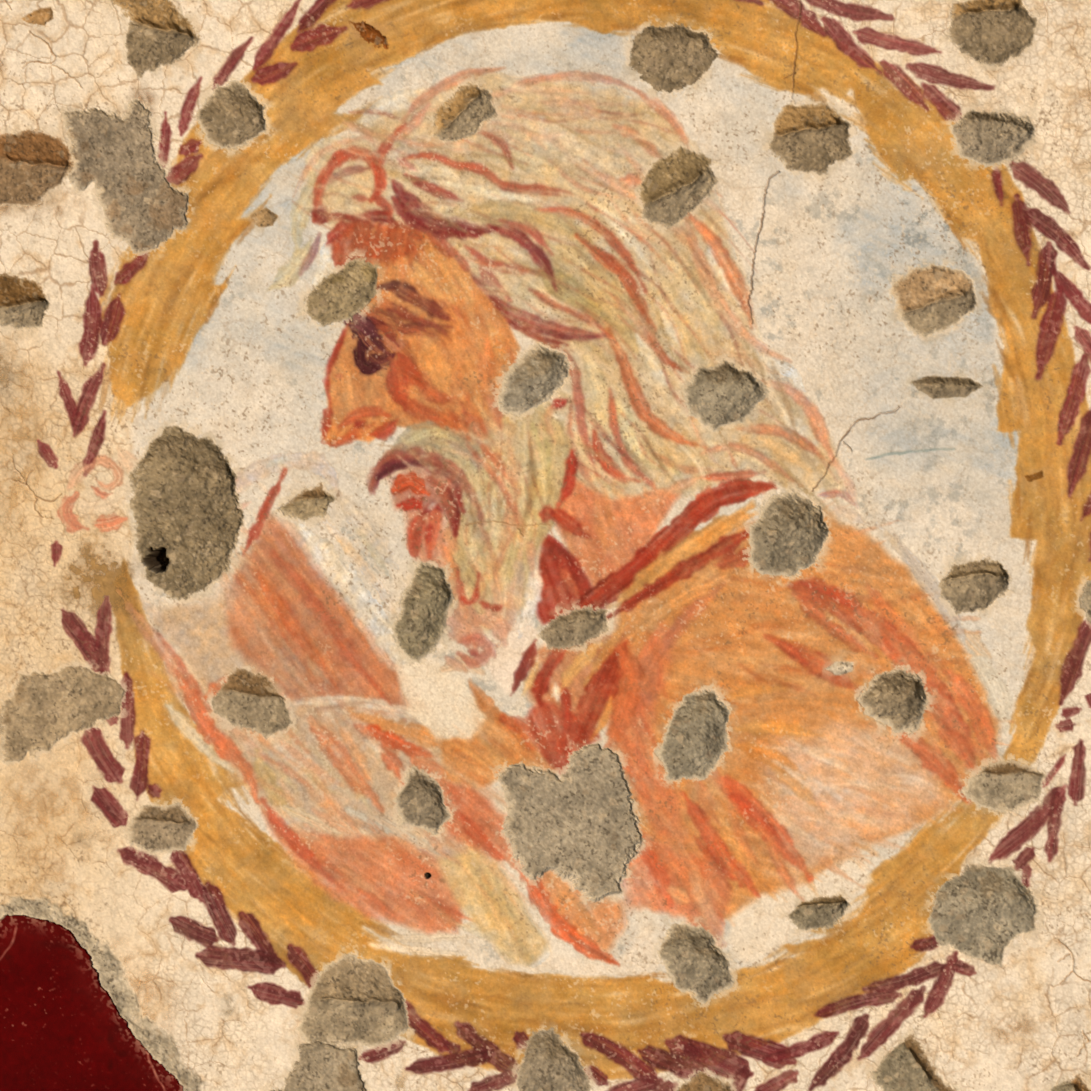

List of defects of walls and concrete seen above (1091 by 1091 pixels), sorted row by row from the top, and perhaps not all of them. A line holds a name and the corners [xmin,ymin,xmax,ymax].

crack [22,31,83,89]
crack [783,0,802,100]
spalling [62,99,190,254]
crack [747,171,780,325]
spalling [129,426,245,601]
crack [812,406,900,492]
spalling [1,666,126,763]
spalling [497,744,644,903]
spalling [0,891,207,1091]
spalling [929,864,1039,967]